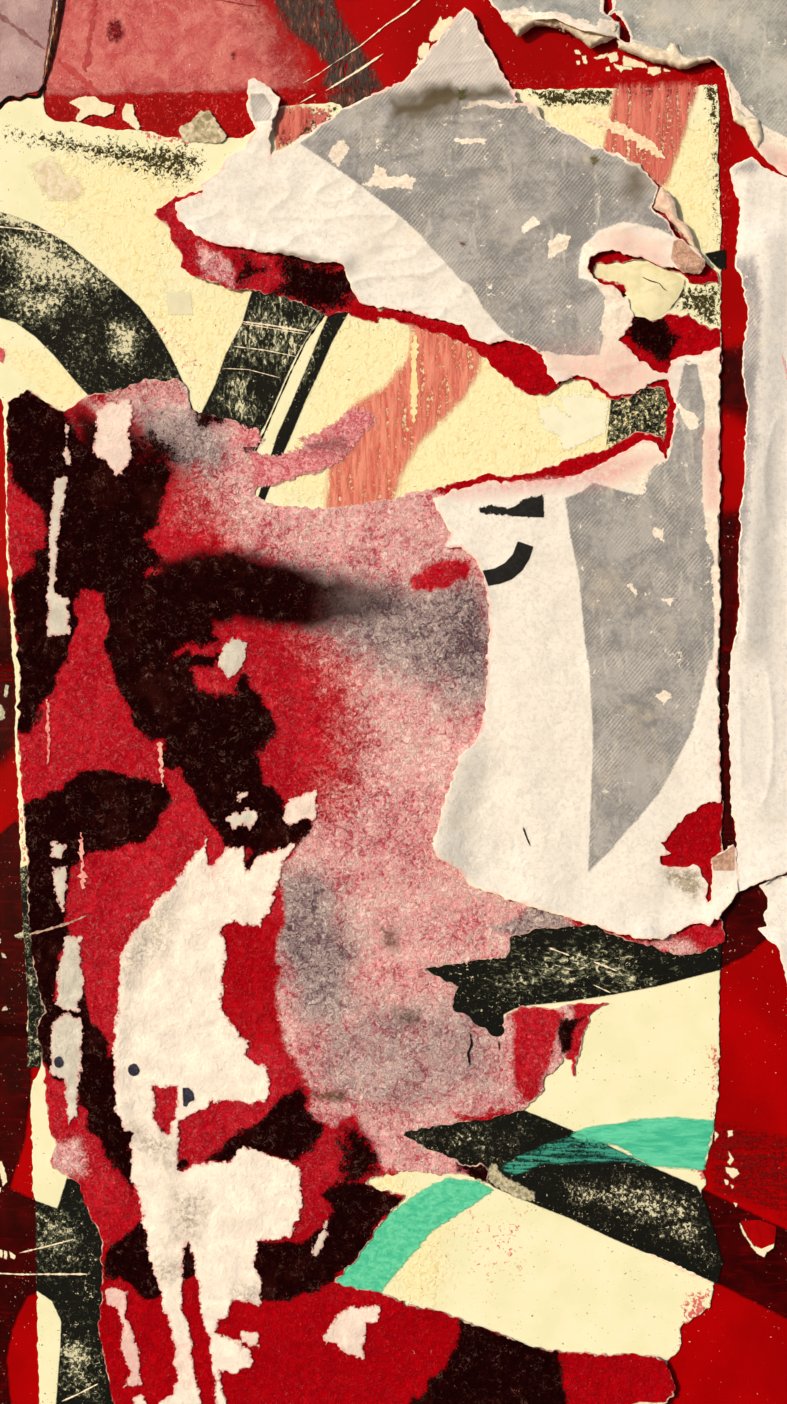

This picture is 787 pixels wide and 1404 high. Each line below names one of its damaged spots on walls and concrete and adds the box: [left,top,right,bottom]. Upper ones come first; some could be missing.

peeling [575,50,670,76]
peeling [179,110,227,144]